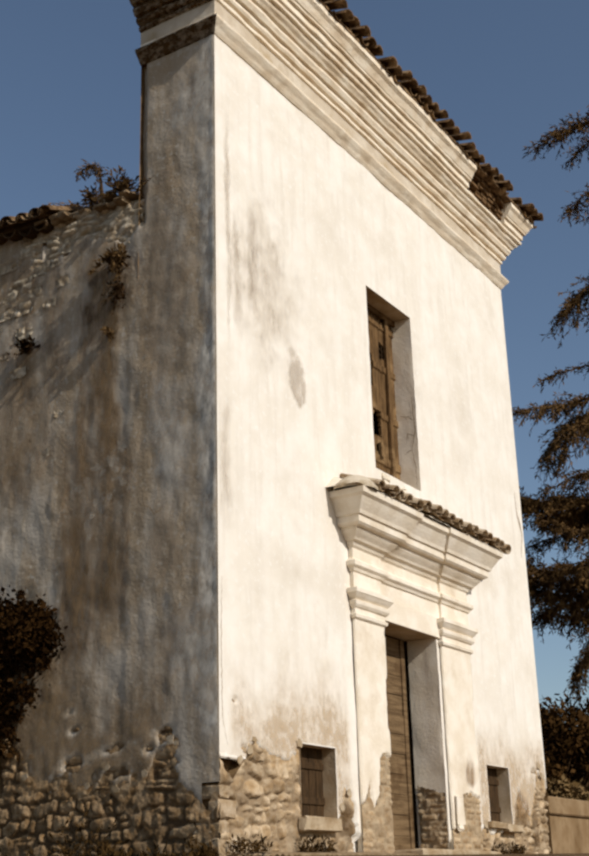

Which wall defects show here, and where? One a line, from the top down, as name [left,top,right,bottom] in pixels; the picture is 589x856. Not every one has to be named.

flaking render [0,226,74,342]
flaking render [47,742,129,820]
flaking render [147,726,179,751]
flaking render [193,736,264,856]
flaking render [361,753,395,853]
flaking render [417,786,502,851]